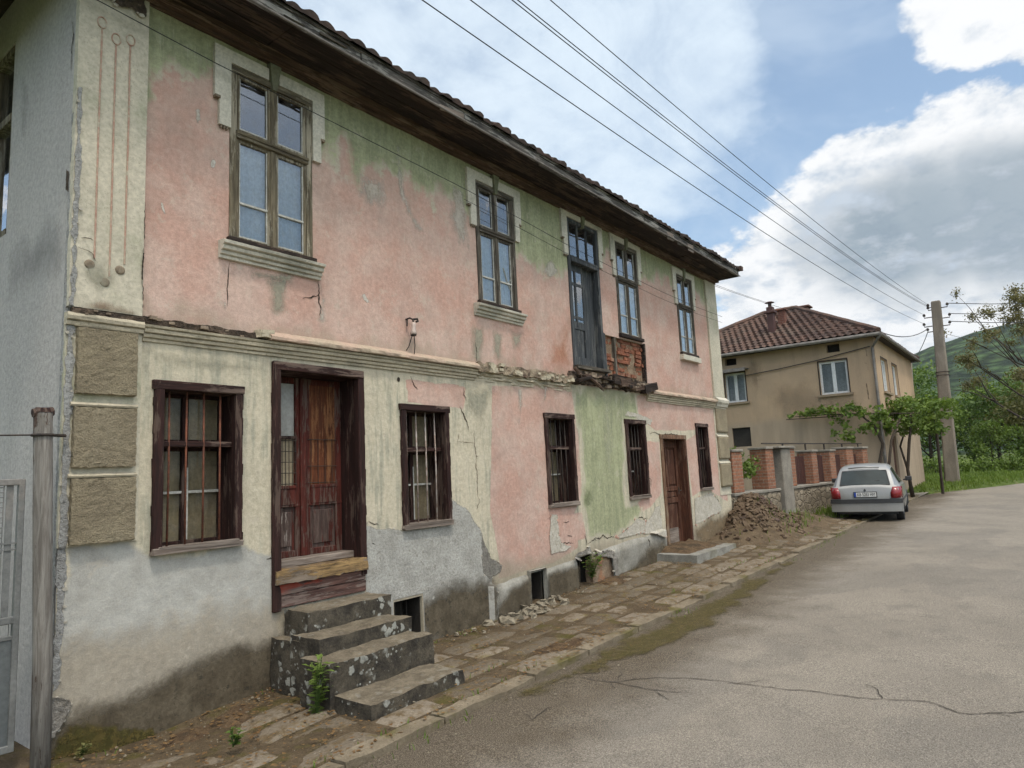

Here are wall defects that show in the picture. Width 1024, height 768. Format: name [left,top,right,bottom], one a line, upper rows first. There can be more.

flaking render [603,332,647,383]
crack [457,395,480,508]
peeling [366,500,502,629]
peeling [549,514,571,554]
crack [561,516,650,555]
damp [51,645,271,760]